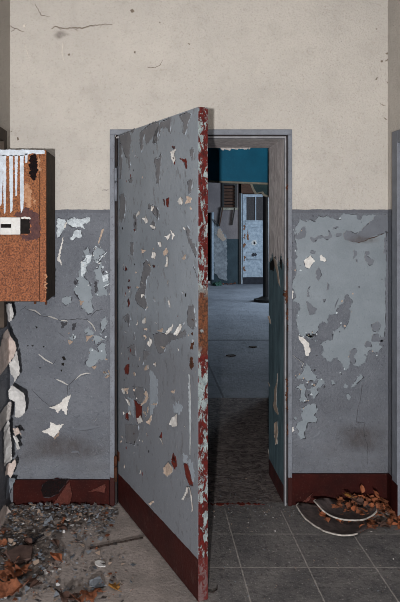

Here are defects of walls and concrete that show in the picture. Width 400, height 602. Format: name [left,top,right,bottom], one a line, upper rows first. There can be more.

crack [35,5,112,60]
peeling [119,117,172,184]
peeling [179,111,192,135]
peeling [56,217,90,265]
peeling [62,229,110,317]
peeling [84,316,108,369]
peeling [120,230,197,449]
peeling [292,213,388,440]
peeling [0,303,26,526]
peeling [33,386,71,415]
peeling [42,422,64,439]
spalling [41,478,72,507]